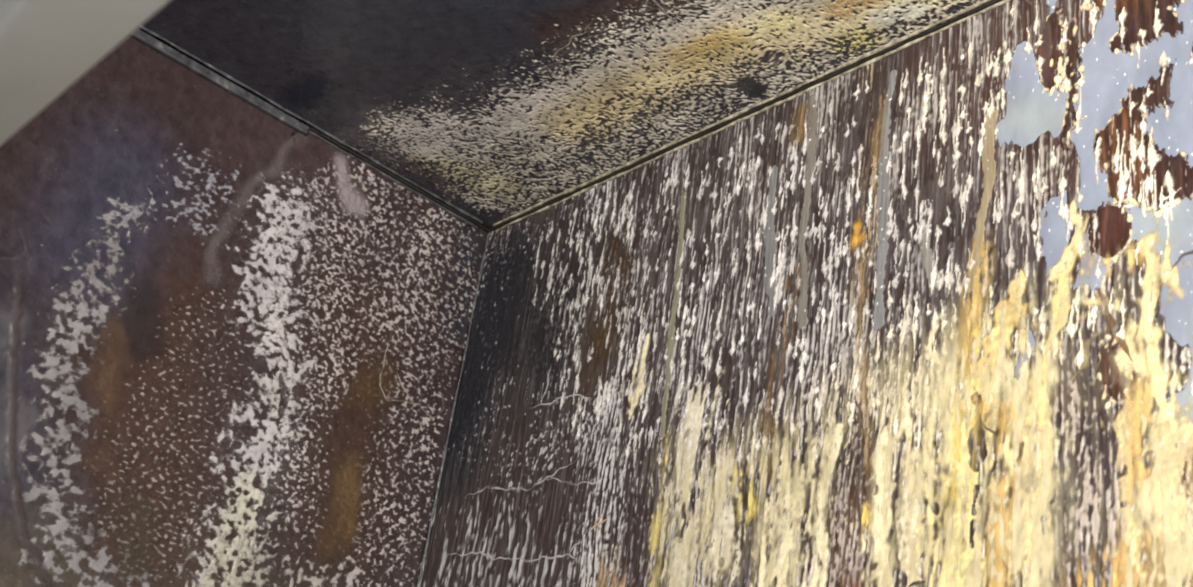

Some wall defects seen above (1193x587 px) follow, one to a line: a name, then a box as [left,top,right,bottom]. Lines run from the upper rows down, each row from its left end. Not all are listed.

leakage [337,0,1193,587]
peeling [996,0,1193,423]